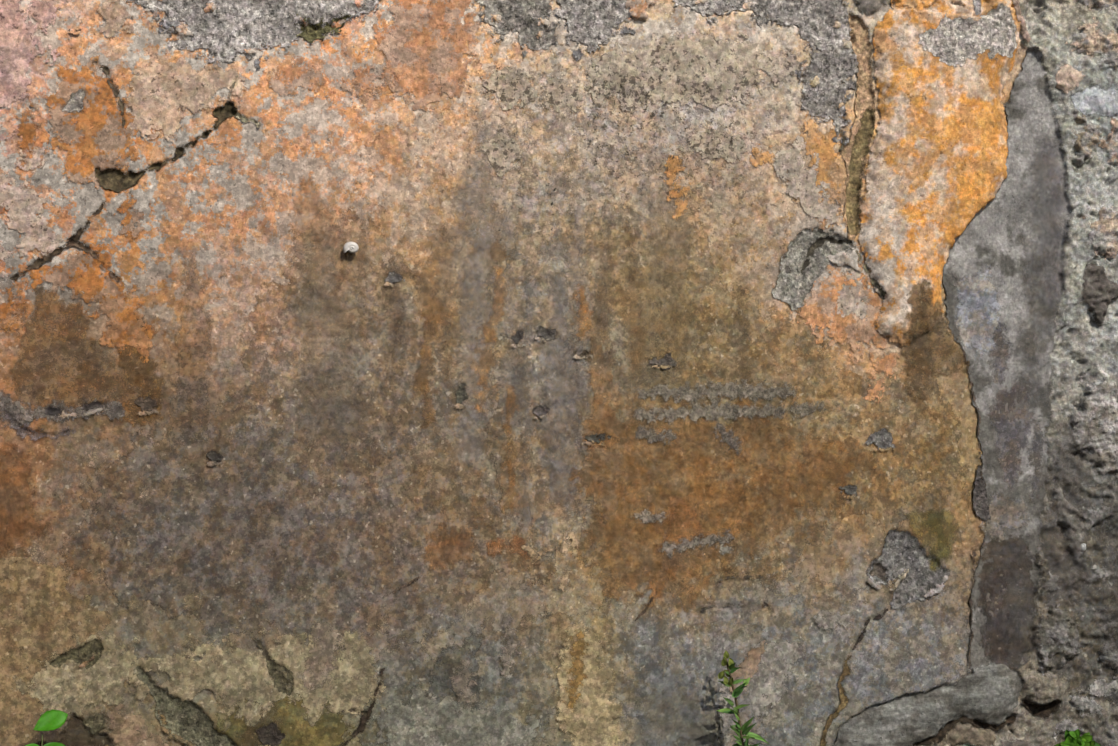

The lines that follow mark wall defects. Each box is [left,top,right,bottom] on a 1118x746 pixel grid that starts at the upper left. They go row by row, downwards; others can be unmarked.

crack [61,62,125,127]
crack [9,76,261,286]
peeling [0,0,902,402]
spalling [867,529,950,612]
crack [820,609,888,746]